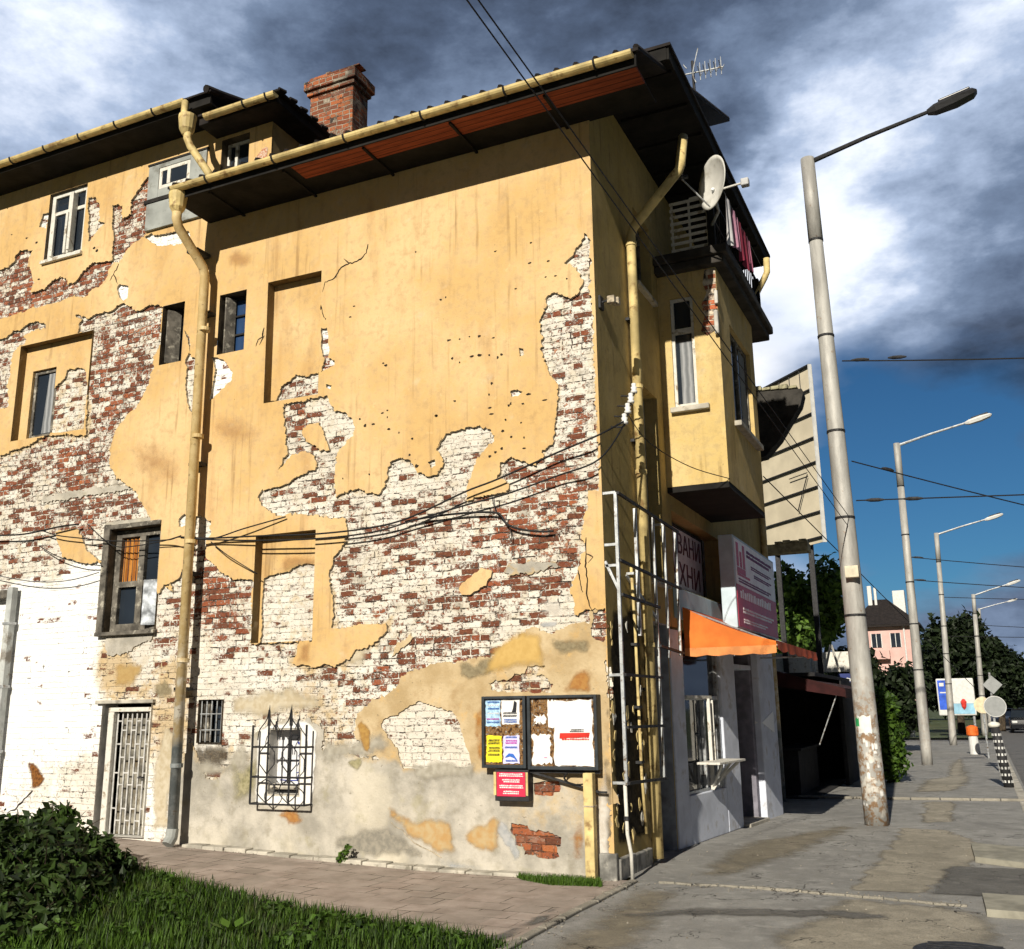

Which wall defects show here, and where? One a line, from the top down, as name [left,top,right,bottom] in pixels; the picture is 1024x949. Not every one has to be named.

flaking render [0,177,190,409]
crack [320,245,368,317]
flaking render [701,268,720,335]
flaking render [0,233,638,842]
damp [197,747,226,767]
damp [234,687,385,804]
damp [414,763,473,780]
peeling [604,660,645,761]
damp [337,830,420,856]
damp [497,822,519,857]
flaking render [466,819,561,859]
peeling [615,773,647,844]